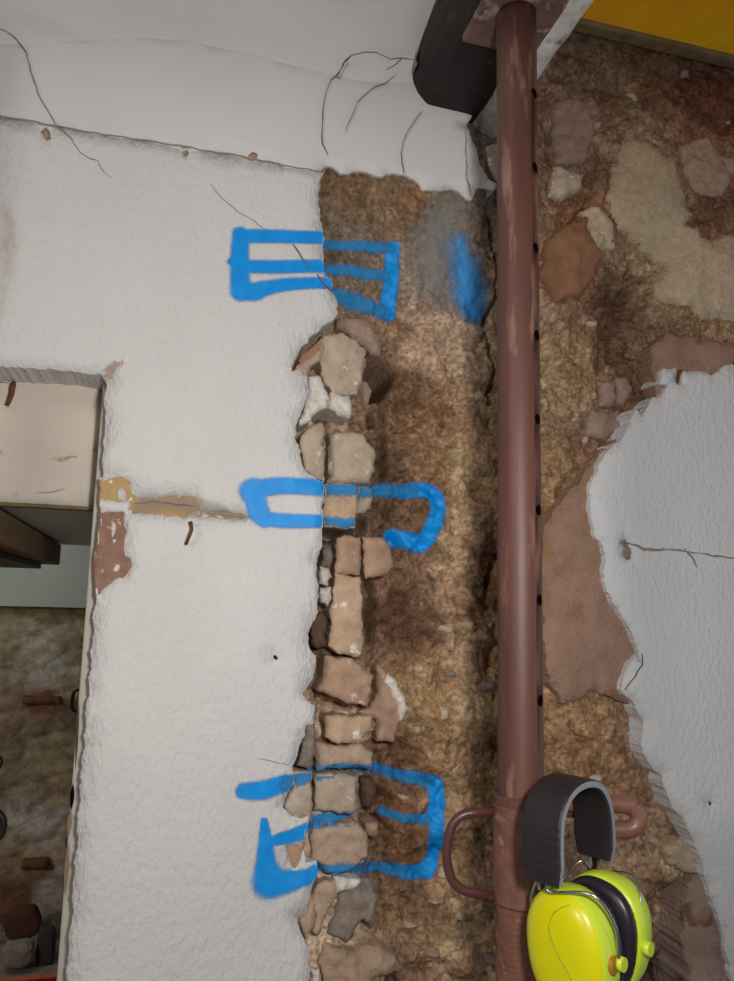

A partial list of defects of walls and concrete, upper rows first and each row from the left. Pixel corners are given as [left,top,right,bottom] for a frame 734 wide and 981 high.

crack [0,29,414,176]
crack [401,110,423,173]
crack [210,183,266,230]
crack [292,244,333,292]
peeling [93,477,250,598]
flaking render [283,123,498,981]
flaking render [537,31,734,981]
crack [626,542,734,568]